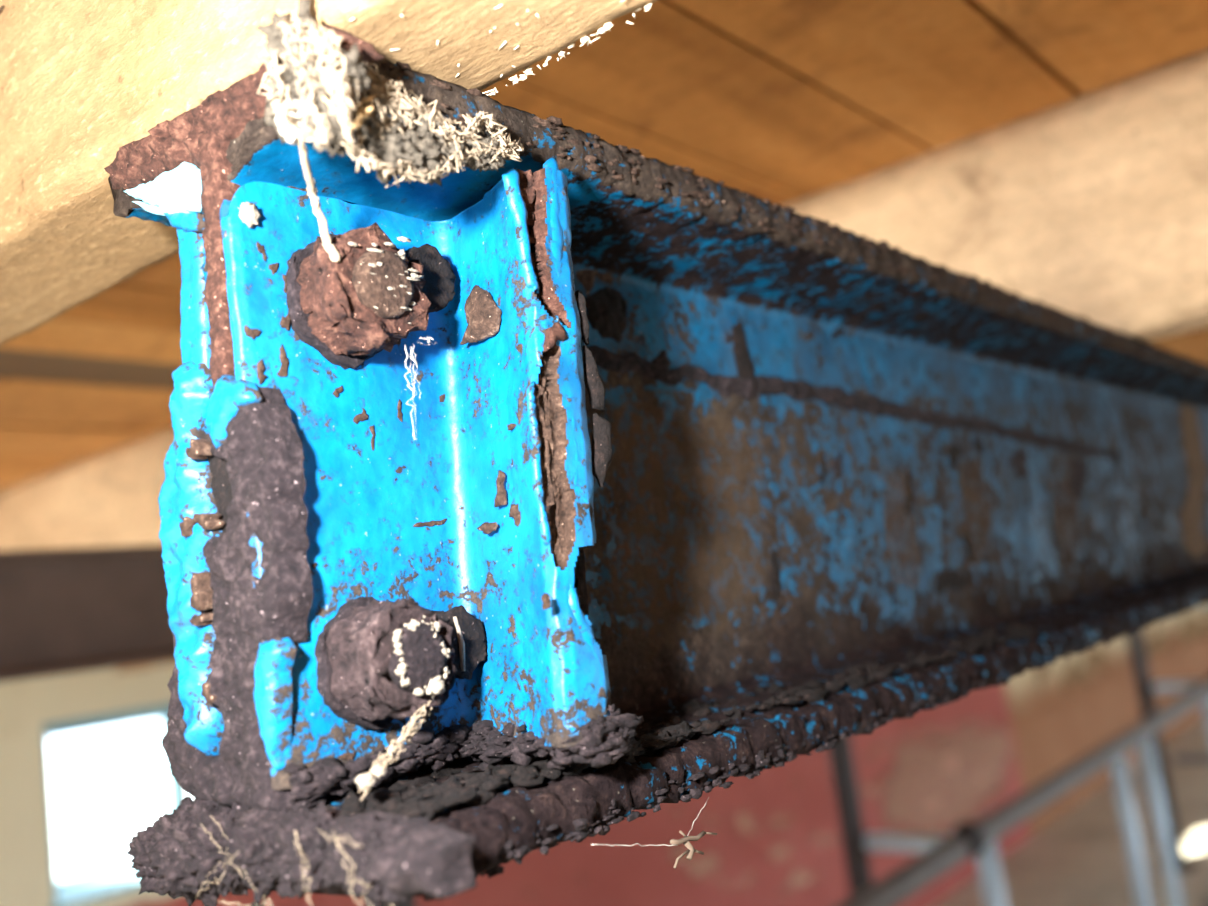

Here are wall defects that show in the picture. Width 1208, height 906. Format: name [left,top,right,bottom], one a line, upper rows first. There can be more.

corrosion [322,24,384,63]
corrosion [104,62,270,232]
corrosion [256,241,287,293]
corrosion [244,325,261,340]
corrosion [280,313,291,331]
spalling [576,269,628,343]
corrosion [257,345,289,385]
spalling [527,344,579,570]
peeling [162,375,313,812]
corrosion [453,616,465,671]
corrosion [283,704,644,813]